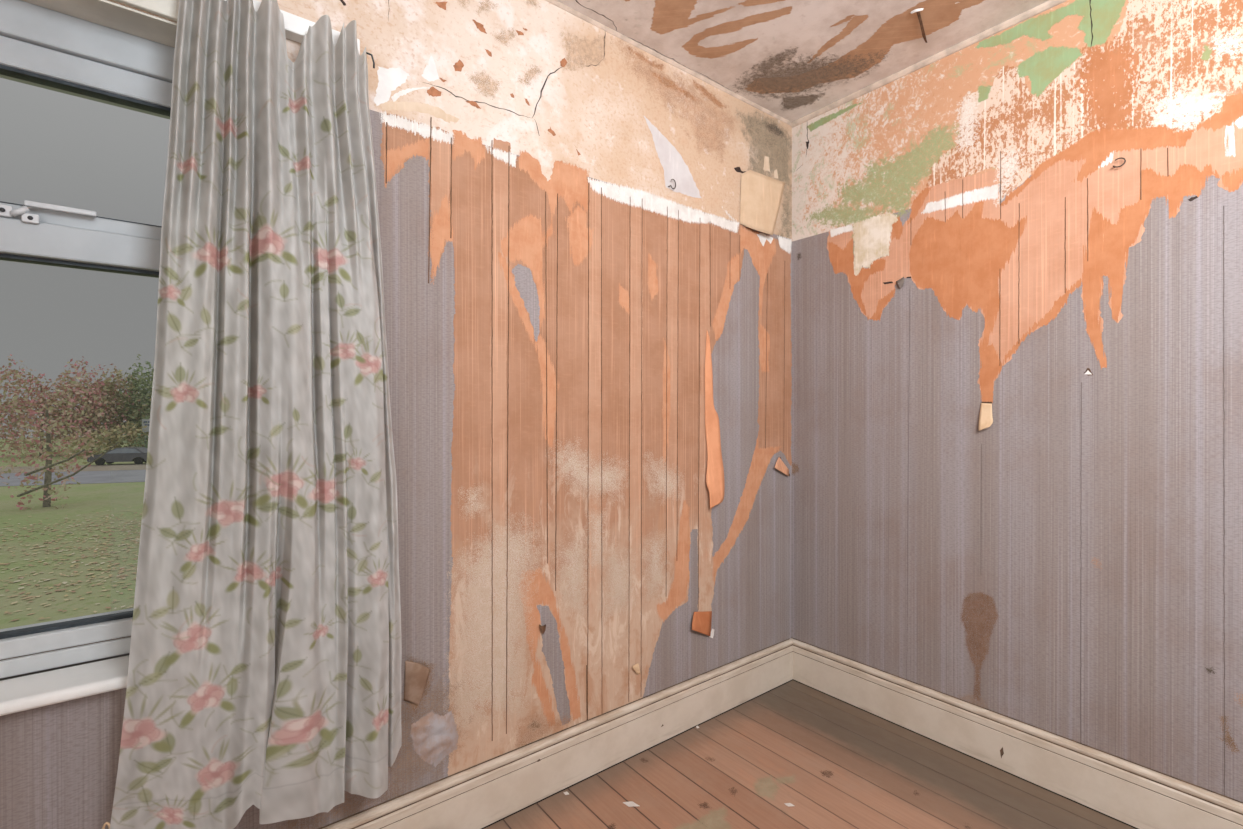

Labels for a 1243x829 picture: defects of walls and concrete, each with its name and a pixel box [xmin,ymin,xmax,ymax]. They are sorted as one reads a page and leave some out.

crack [423,0,728,134]
leakage [729,45,893,239]
peeling [744,0,984,94]
peeling [804,0,1243,276]
peeling [705,331,725,509]
leakage [958,591,1000,708]